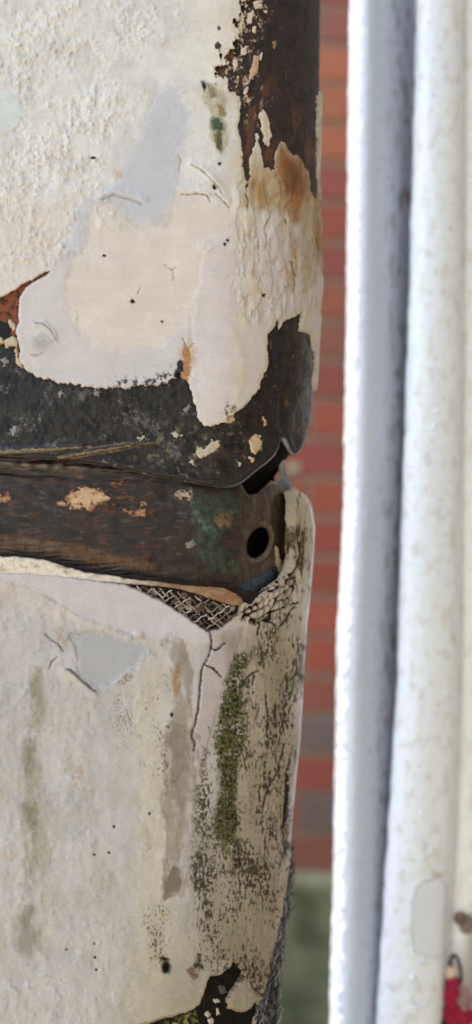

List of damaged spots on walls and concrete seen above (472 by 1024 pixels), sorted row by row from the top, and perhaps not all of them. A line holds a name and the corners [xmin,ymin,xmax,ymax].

peeling [215,0,320,200]
peeling [0,272,314,501]
peeling [0,491,12,506]
peeling [56,480,147,518]
rust [0,534,154,571]
peeling [275,546,283,574]
spalling [128,584,248,631]
crack [191,632,225,750]
damp [146,603,306,995]
spalling [150,954,258,1024]